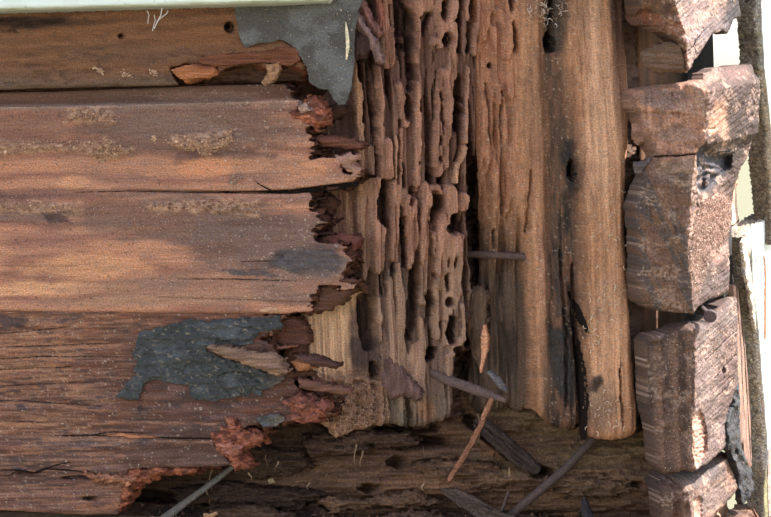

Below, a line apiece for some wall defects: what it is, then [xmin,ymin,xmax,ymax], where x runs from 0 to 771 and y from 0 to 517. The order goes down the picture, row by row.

spalling [0,60,377,192]
spalling [192,185,370,357]
peeling [236,361,271,378]
peeling [381,358,425,402]
peeling [466,283,491,370]
crack [2,462,83,476]
spalling [0,367,345,517]